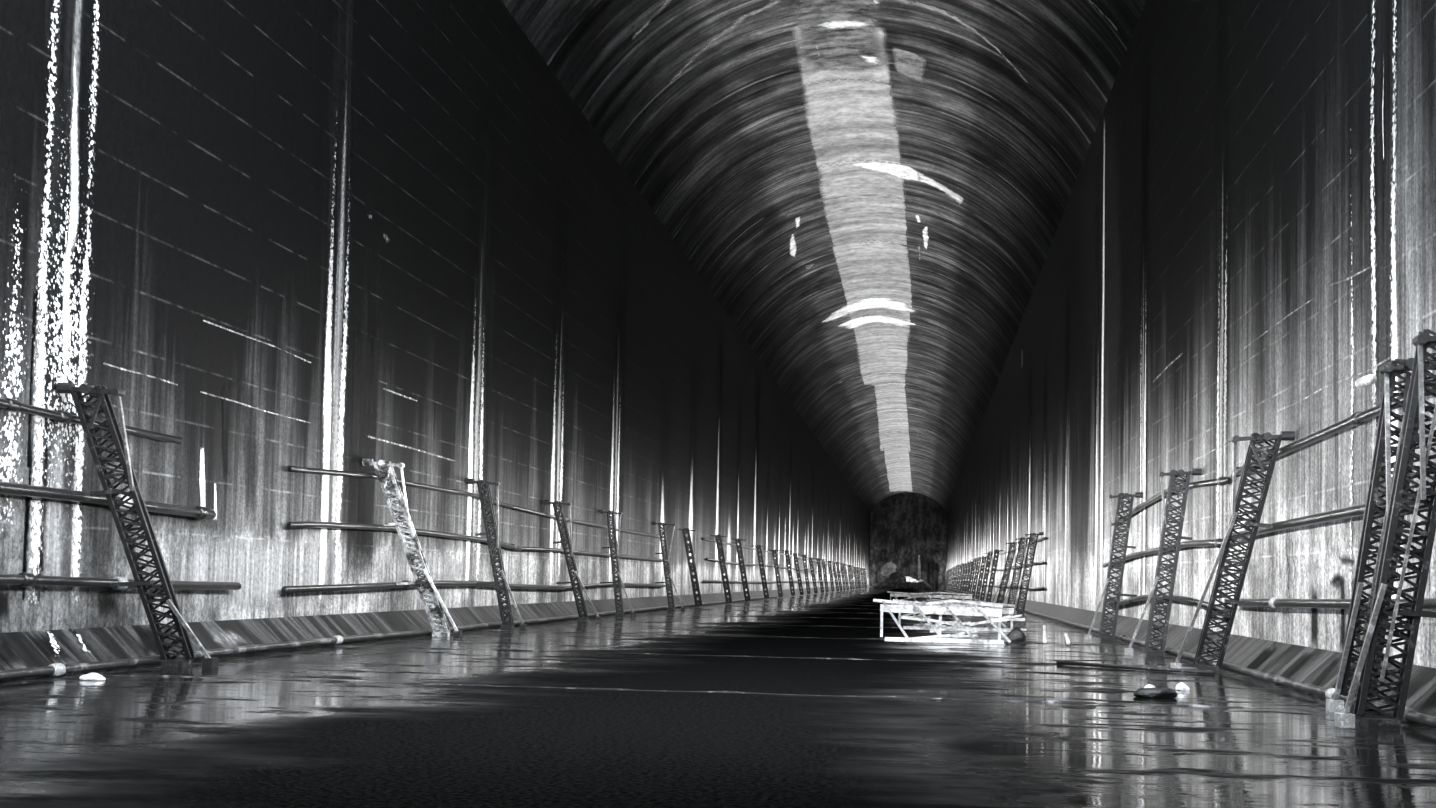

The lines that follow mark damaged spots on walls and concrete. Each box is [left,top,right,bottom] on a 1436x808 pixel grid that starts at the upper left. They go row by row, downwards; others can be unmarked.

leakage [0,0,100,605]
leakage [1330,244,1381,595]
leakage [1370,0,1398,496]